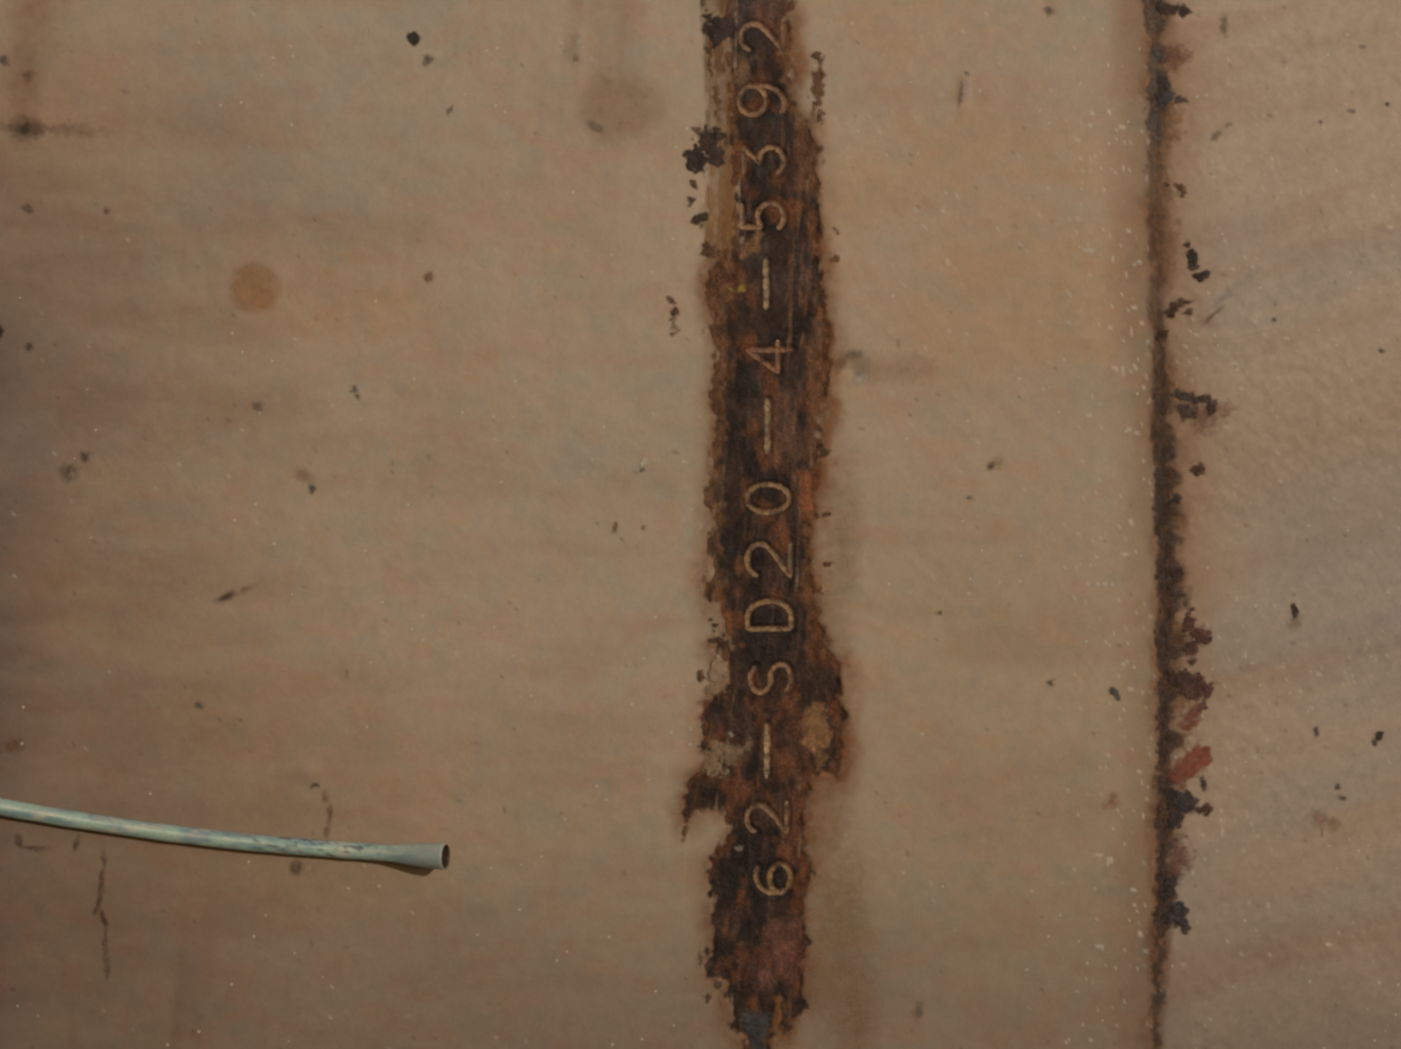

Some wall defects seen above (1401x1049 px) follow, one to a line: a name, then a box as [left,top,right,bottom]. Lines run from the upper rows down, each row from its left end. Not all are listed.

corrosion [1143,0,1193,167]
corrosion [667,296,680,335]
corrosion [1144,183,1210,284]
corrosion [682,0,856,1049]
corrosion [1147,298,1218,1048]